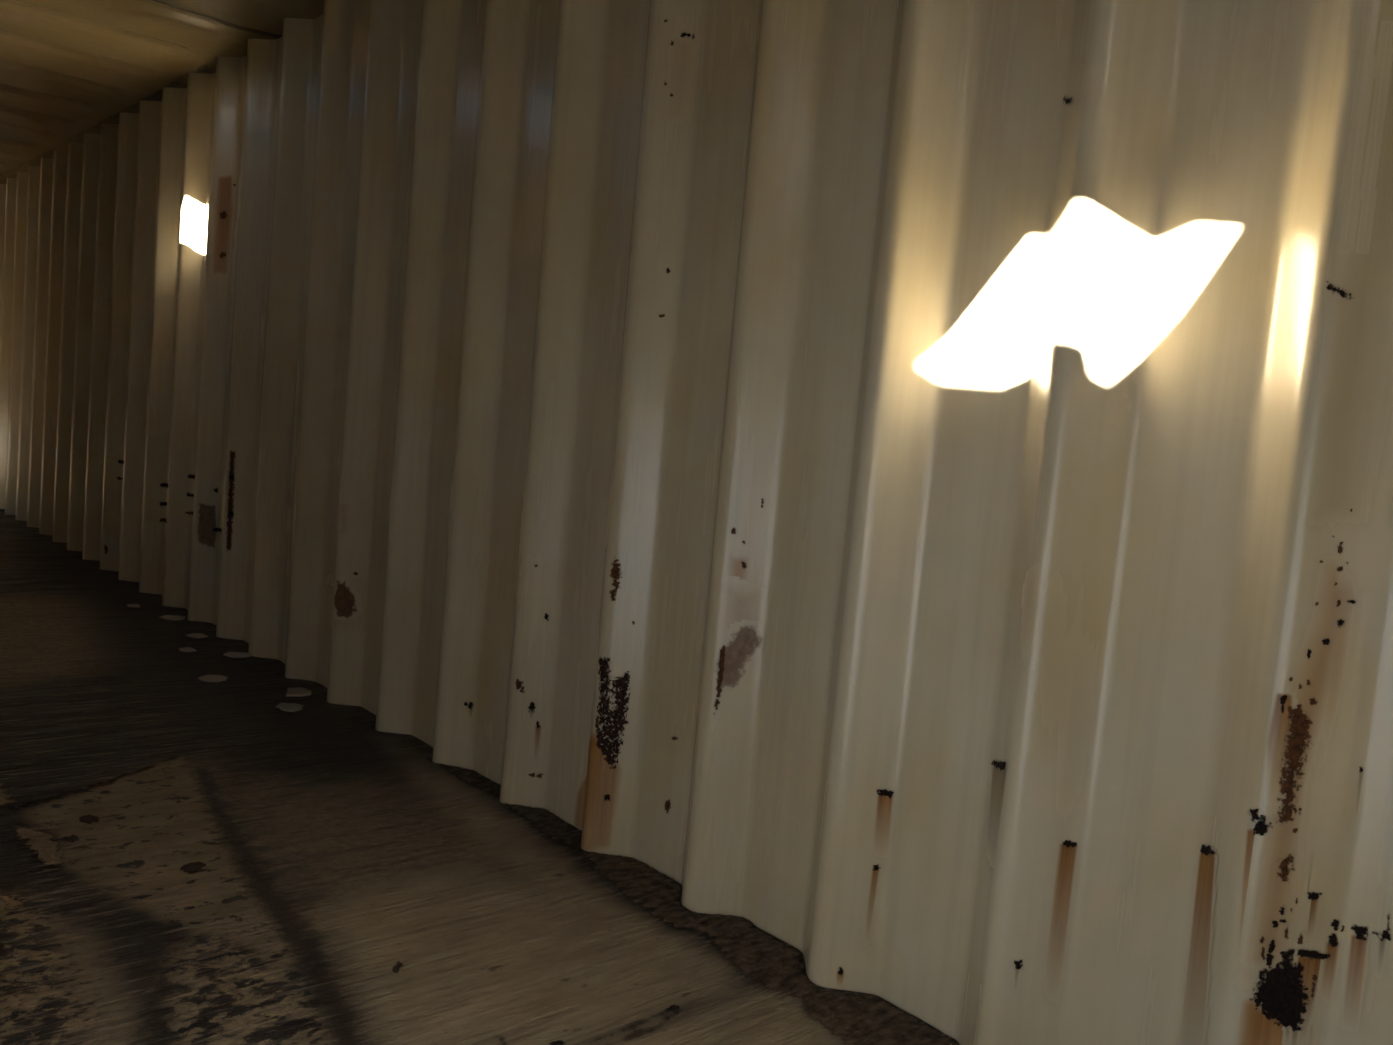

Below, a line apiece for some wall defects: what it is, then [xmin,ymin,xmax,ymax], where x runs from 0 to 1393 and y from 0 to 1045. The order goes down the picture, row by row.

corrosion [610,559,622,601]
corrosion [711,528,772,715]
corrosion [570,657,631,854]
corrosion [860,789,896,954]
corrosion [984,547,1136,1010]
corrosion [1174,844,1218,1045]
corrosion [1226,536,1391,1045]